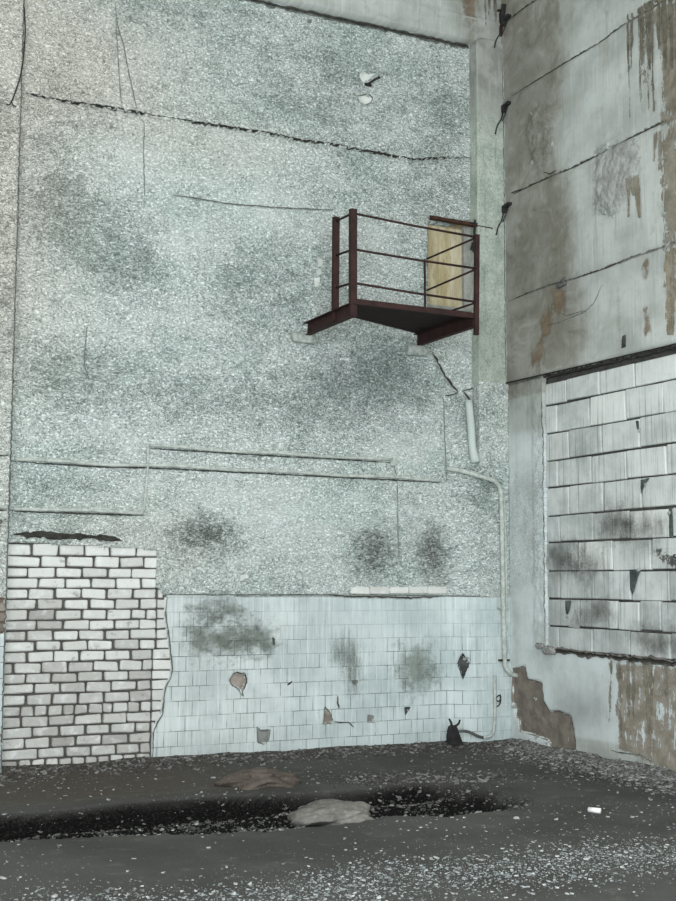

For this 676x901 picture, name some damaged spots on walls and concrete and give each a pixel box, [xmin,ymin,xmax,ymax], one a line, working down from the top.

peeling [625,174,641,218]
peeling [653,108,676,252]
crack [0,0,510,771]
leakage [190,626,273,652]
spalling [229,672,248,697]
spalling [457,653,469,679]
spalling [257,727,270,745]
spalling [323,706,335,725]
spalling [512,666,576,750]
peeling [609,660,676,771]